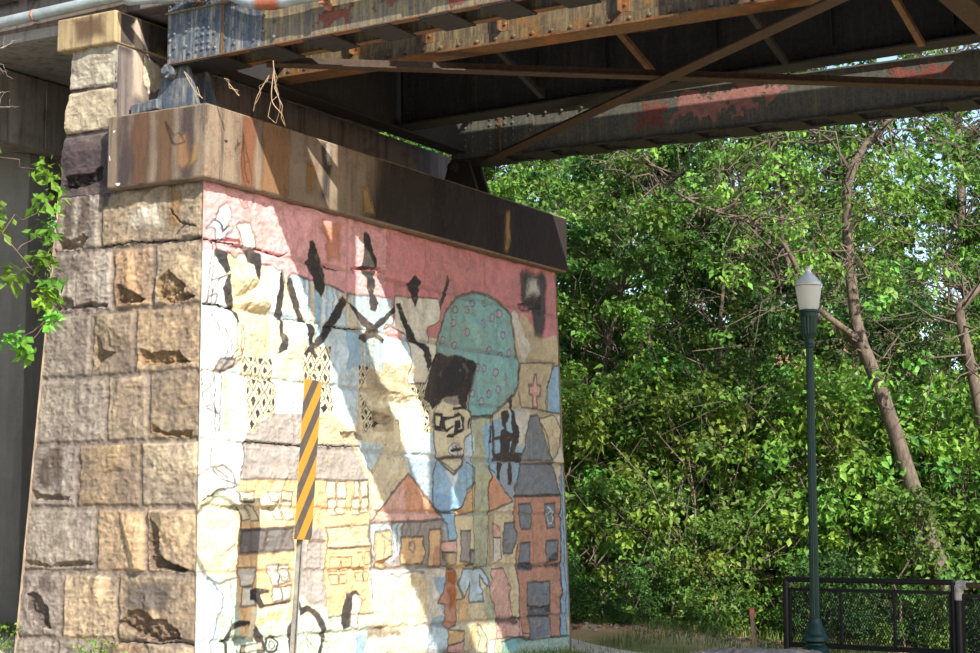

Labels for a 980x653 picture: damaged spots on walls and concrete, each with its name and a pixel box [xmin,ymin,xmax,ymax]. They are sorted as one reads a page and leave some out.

corrosion [255,0,282,11]
peeling [884,59,952,90]
peeling [635,83,788,131]
corrosion [178,135,197,168]
corrosion [242,115,290,197]
spalling [52,284,145,312]
spalling [156,270,195,305]
spalling [139,348,191,365]
spalling [148,517,188,572]
spalling [27,591,51,629]
spalling [119,610,182,644]